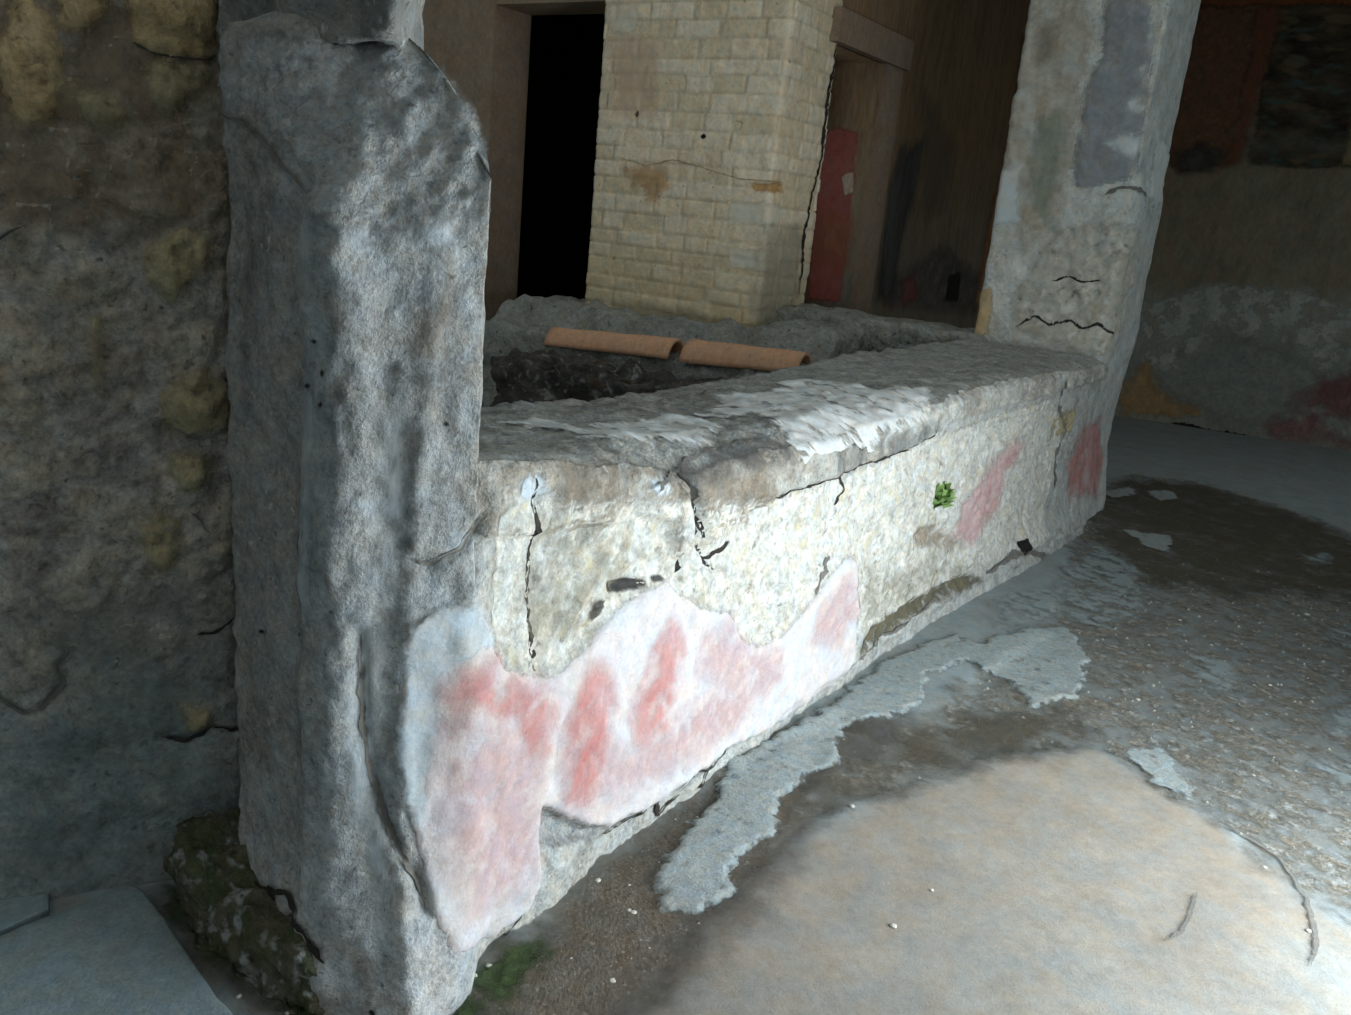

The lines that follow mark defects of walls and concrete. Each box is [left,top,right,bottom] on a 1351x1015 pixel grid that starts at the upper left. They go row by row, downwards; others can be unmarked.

crack [623,45,837,293]
spalling [753,182,783,193]
peeling [808,128,858,302]
peeling [974,0,1351,355]
crack [1016,315,1114,334]
crack [660,435,771,573]
damp [1091,481,1351,597]
peeling [397,397,1062,954]
damp [1188,654,1234,691]
damp [817,708,1055,811]
damp [1313,757,1351,790]
crack [254,881,324,964]